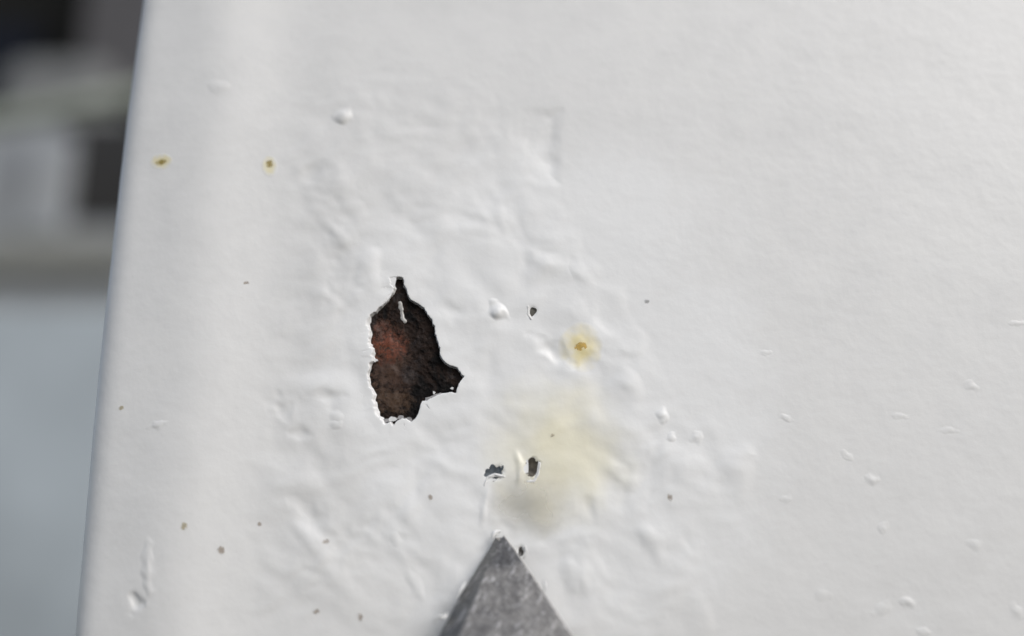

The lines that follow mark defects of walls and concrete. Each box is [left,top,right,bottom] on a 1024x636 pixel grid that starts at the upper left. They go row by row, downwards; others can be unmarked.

corrosion [149,153,173,170]
corrosion [261,155,278,177]
peeling [356,267,474,436]
corrosion [469,321,649,542]
peeling [483,464,506,486]
peeling [526,457,541,482]